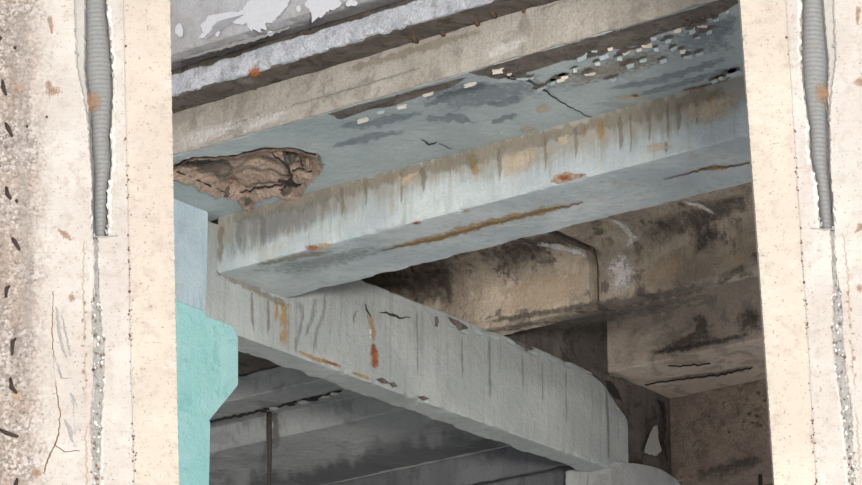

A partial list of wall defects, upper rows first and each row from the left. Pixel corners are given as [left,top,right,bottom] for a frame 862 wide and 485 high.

crack [44,238,106,485]
crack [123,1,137,485]
spalling [173,147,323,211]
peeling [181,0,358,63]
rust [367,314,378,367]
leakage [234,17,734,221]
peeling [328,0,741,124]
leakage [486,220,752,331]
leakage [654,198,744,249]
leakage [657,310,758,354]
crack [785,0,818,485]
crack [830,231,862,485]